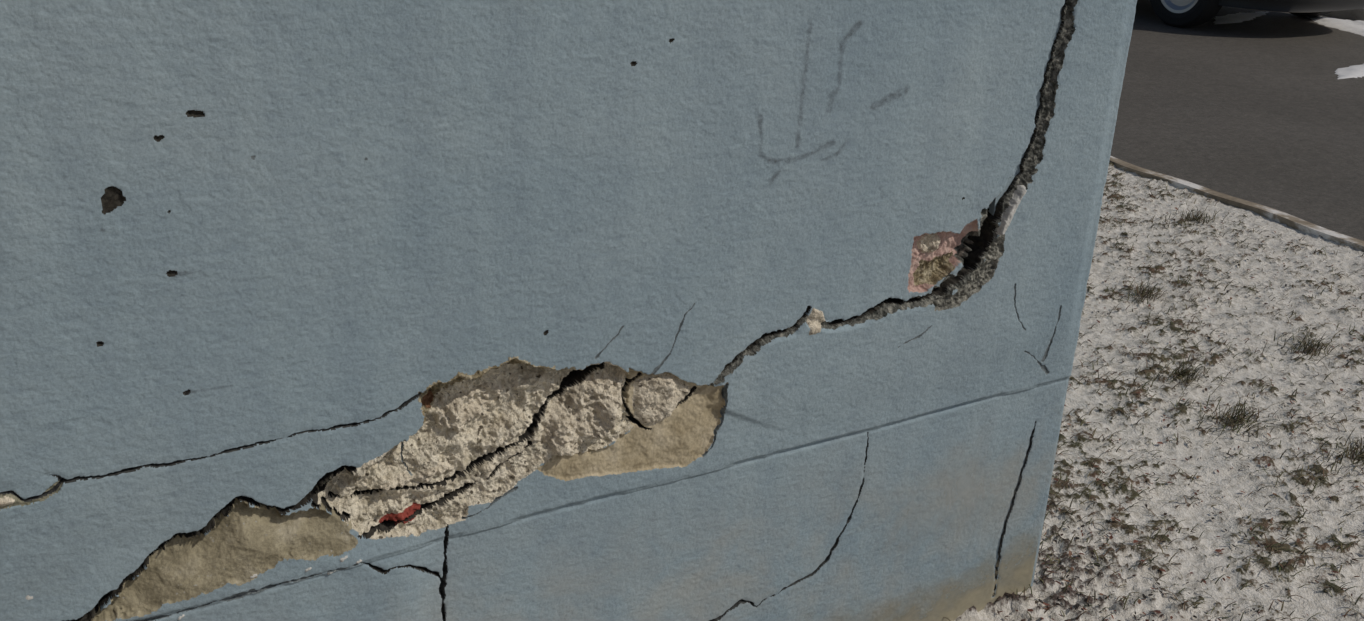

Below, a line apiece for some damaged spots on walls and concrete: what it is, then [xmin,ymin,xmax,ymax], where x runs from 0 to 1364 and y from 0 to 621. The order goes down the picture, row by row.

crack [708,0,1078,387]
spalling [908,219,979,293]
crack [595,326,624,359]
crack [651,303,695,375]
peeling [0,477,64,511]
crack [51,392,421,484]
crack [66,465,449,621]
spalling [311,356,729,540]
crack [709,432,869,621]
crack [992,421,1036,597]